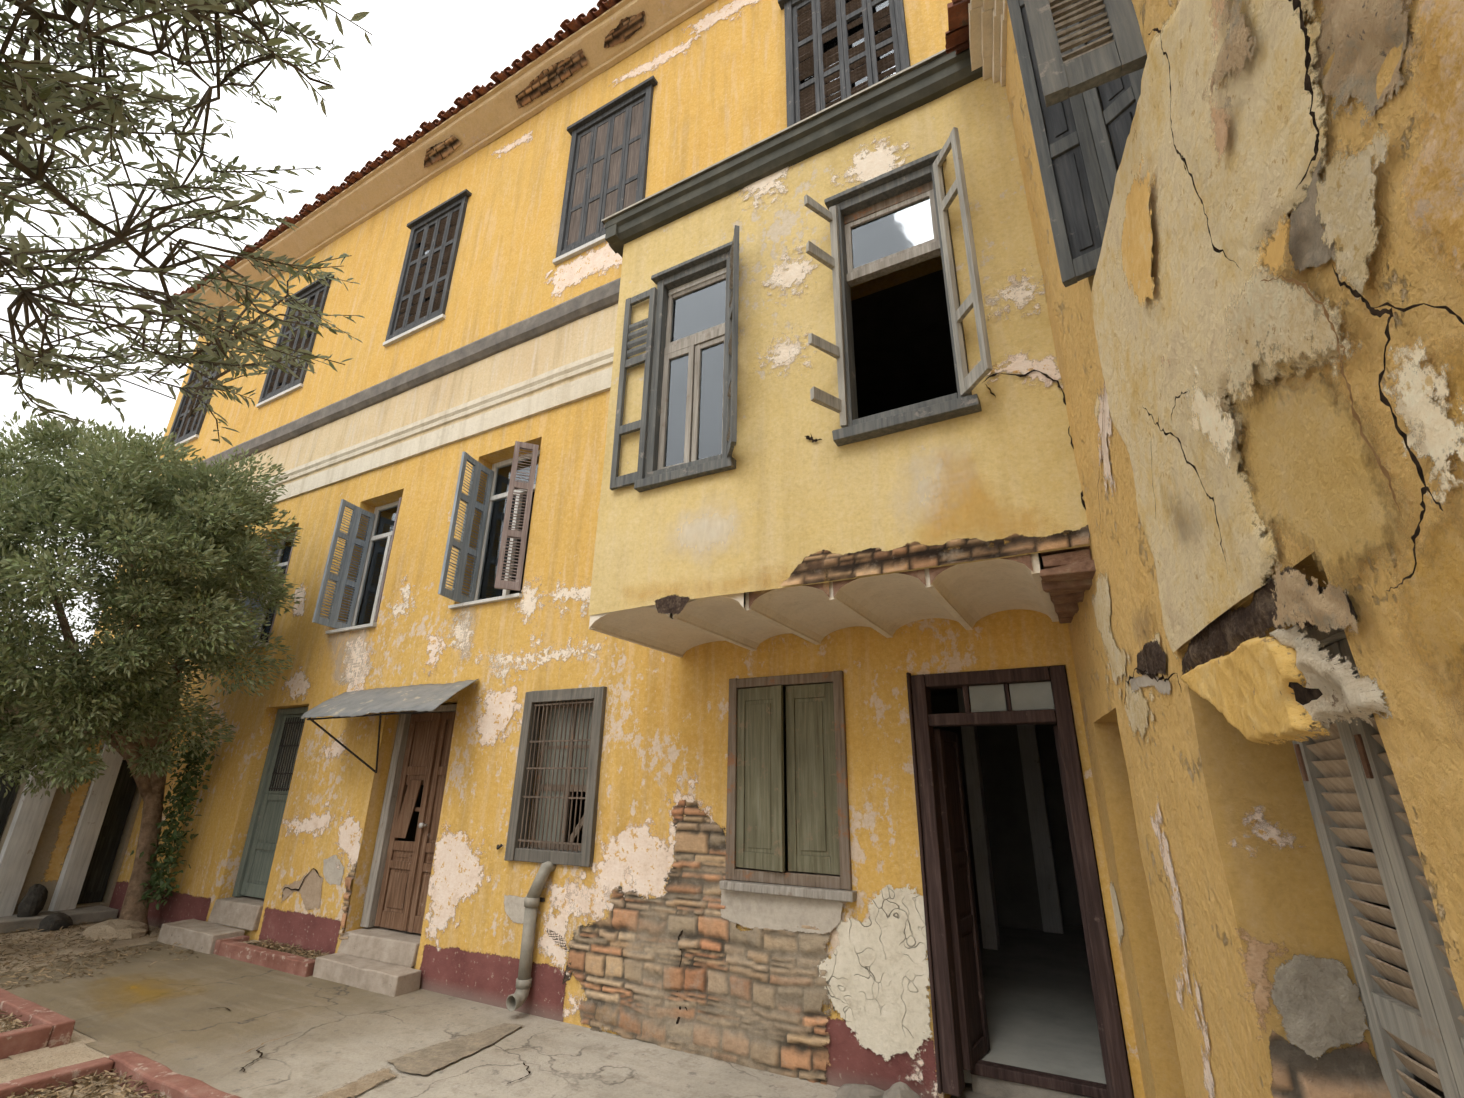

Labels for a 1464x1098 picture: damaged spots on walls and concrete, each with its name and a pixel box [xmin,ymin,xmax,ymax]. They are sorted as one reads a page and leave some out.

peeling [604,0,760,87]
peeling [544,241,622,297]
crack [1142,0,1464,592]
peeling [1185,0,1464,468]
crack [984,369,1105,539]
peeling [1383,337,1464,698]
peeling [426,572,607,747]
spalling [781,525,1393,743]
flaking render [281,801,362,940]
peeling [425,824,491,951]
flaking render [538,774,938,1098]
flaking render [1237,928,1391,1098]